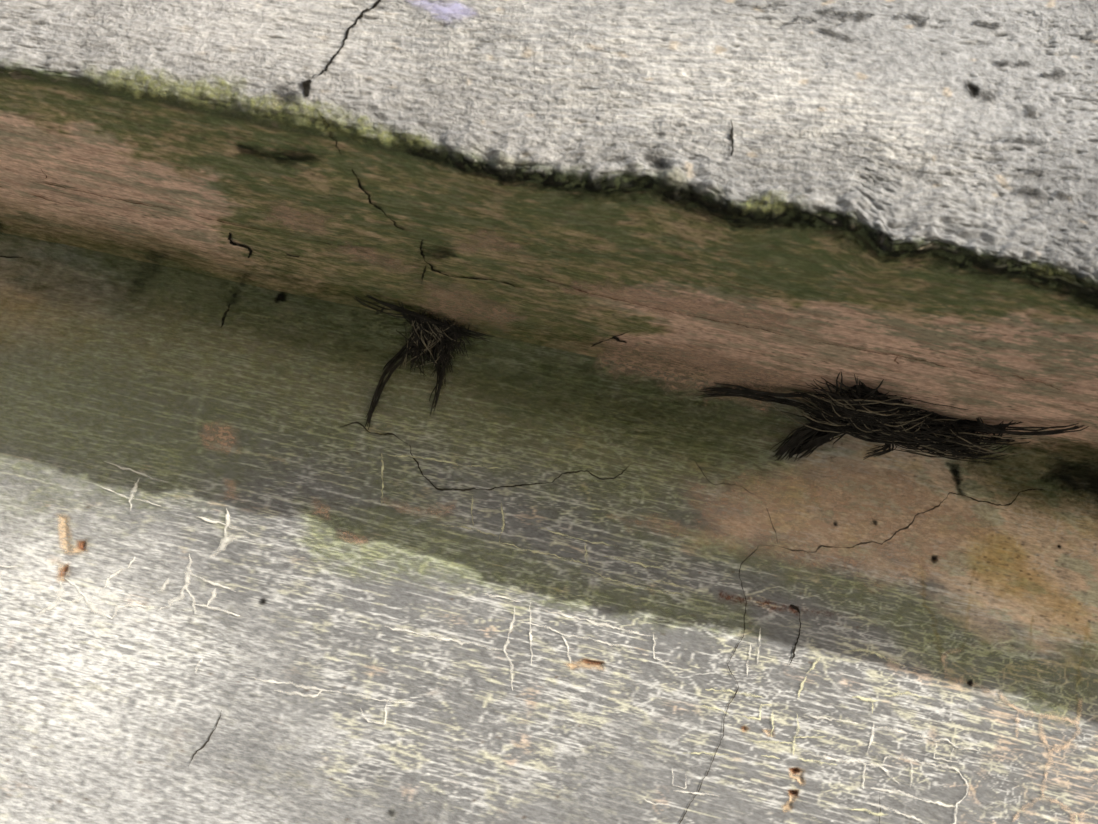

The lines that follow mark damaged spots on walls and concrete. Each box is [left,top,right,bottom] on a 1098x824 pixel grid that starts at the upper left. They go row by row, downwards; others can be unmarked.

crack [341,422,630,491]
crack [679,457,1042,824]
crack [188,714,221,766]